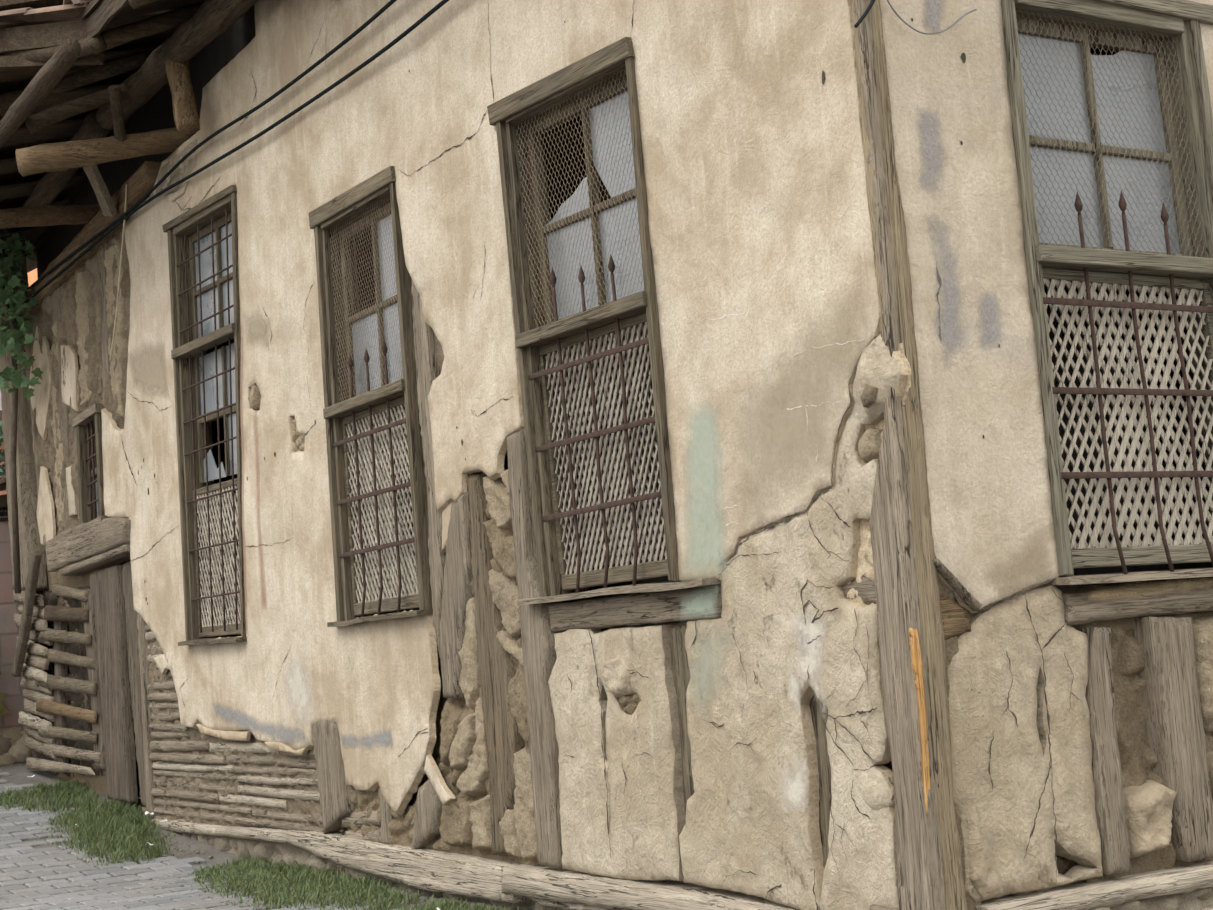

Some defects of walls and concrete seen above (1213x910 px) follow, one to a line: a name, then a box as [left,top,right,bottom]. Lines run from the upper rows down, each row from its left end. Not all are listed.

crack [398,4,494,176]
spalling [24,228,131,547]
spalling [147,630,323,829]
spalling [348,469,540,866]
crack [702,719,756,753]
crack [718,334,879,910]
spalling [1070,612,1213,883]
crack [683,870,781,906]